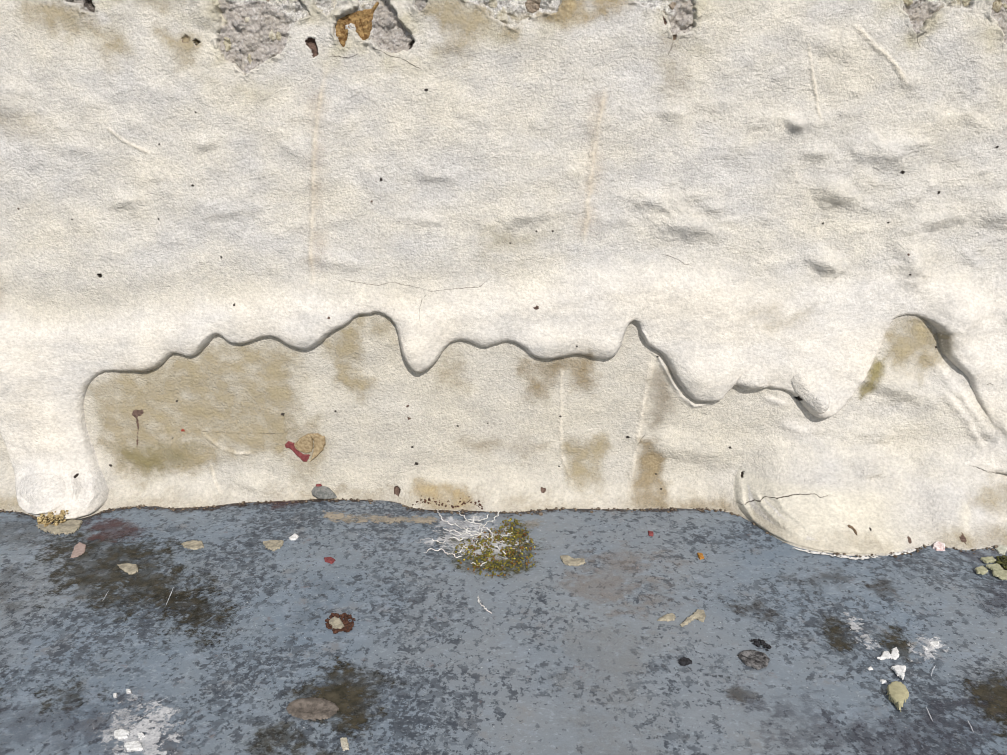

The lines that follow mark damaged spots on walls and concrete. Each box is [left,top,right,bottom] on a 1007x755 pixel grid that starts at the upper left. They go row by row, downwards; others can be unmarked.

spalling [335,2,379,47]
peeling [525,0,541,13]
leakage [336,328,367,390]
leakage [104,346,292,469]
leakage [565,439,608,483]
leakage [635,441,666,506]
crack [741,493,828,505]